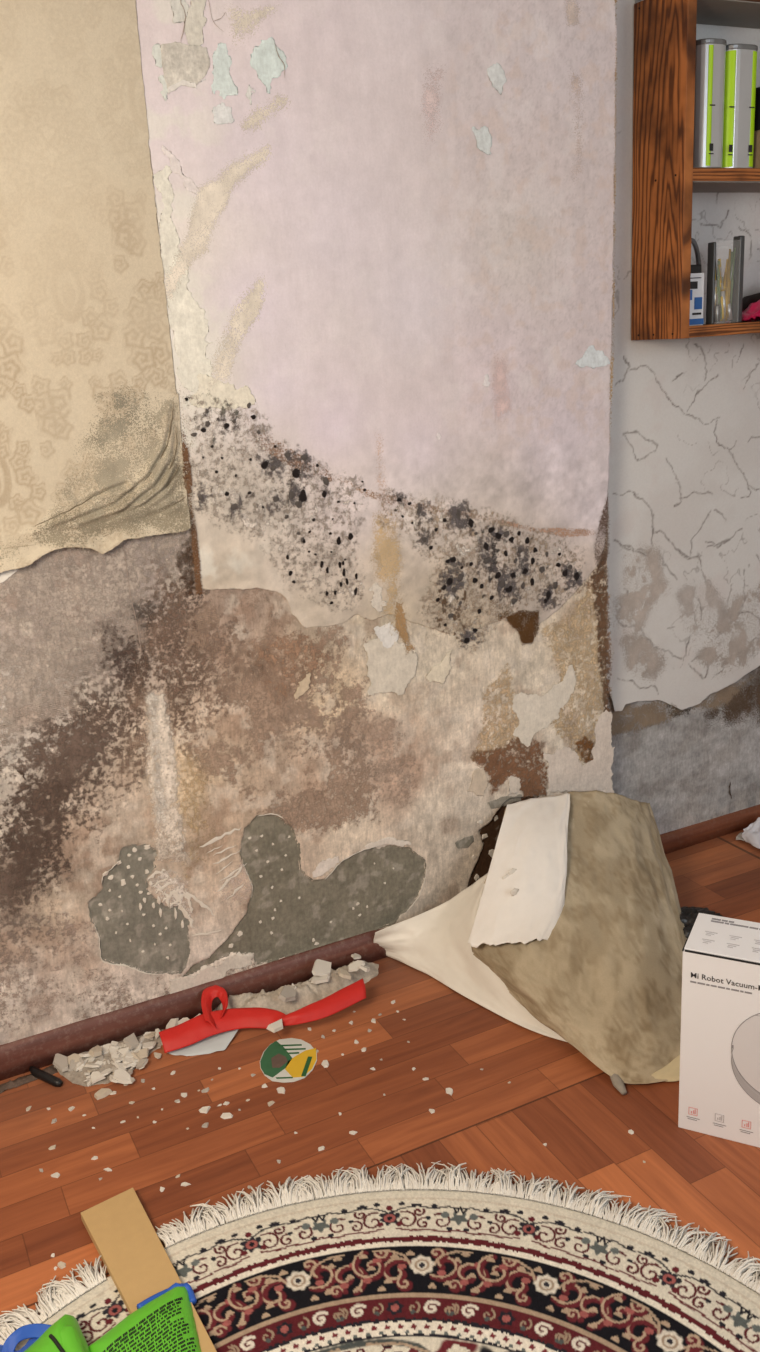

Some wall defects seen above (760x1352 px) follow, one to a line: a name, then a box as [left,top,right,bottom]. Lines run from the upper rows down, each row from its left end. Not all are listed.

flaking render [152,0,288,124]
peeling [153,145,256,411]
water stain [609,0,618,445]
peeling [294,672,312,699]
water stain [0,384,760,1027]
peeling [363,583,451,696]
peeling [455,664,615,887]
flaking render [87,813,427,994]